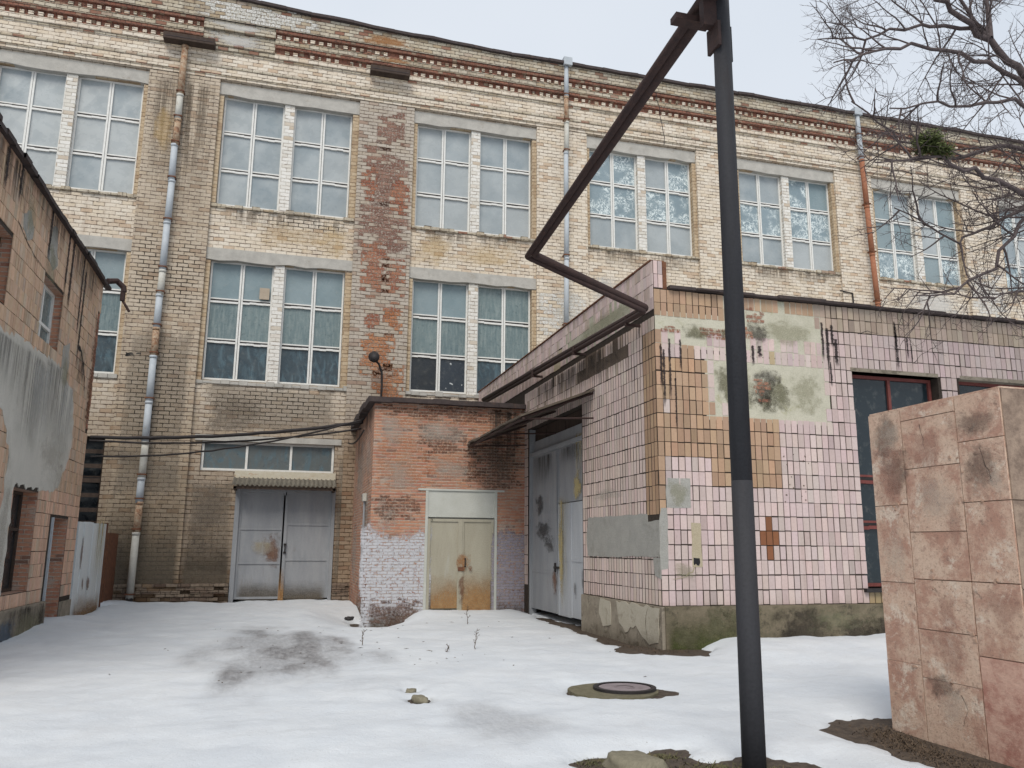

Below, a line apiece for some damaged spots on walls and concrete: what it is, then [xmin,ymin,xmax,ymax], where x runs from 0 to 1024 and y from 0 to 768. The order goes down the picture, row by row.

spalling [358,112,516,454]
damp [820,322,838,383]
damp [659,339,682,424]
corrosion [239,582,322,600]
peeling [357,495,432,628]
corrosion [429,555,491,610]
flaking render [599,598,660,645]
damp [783,611,824,637]
damp [844,619,885,636]